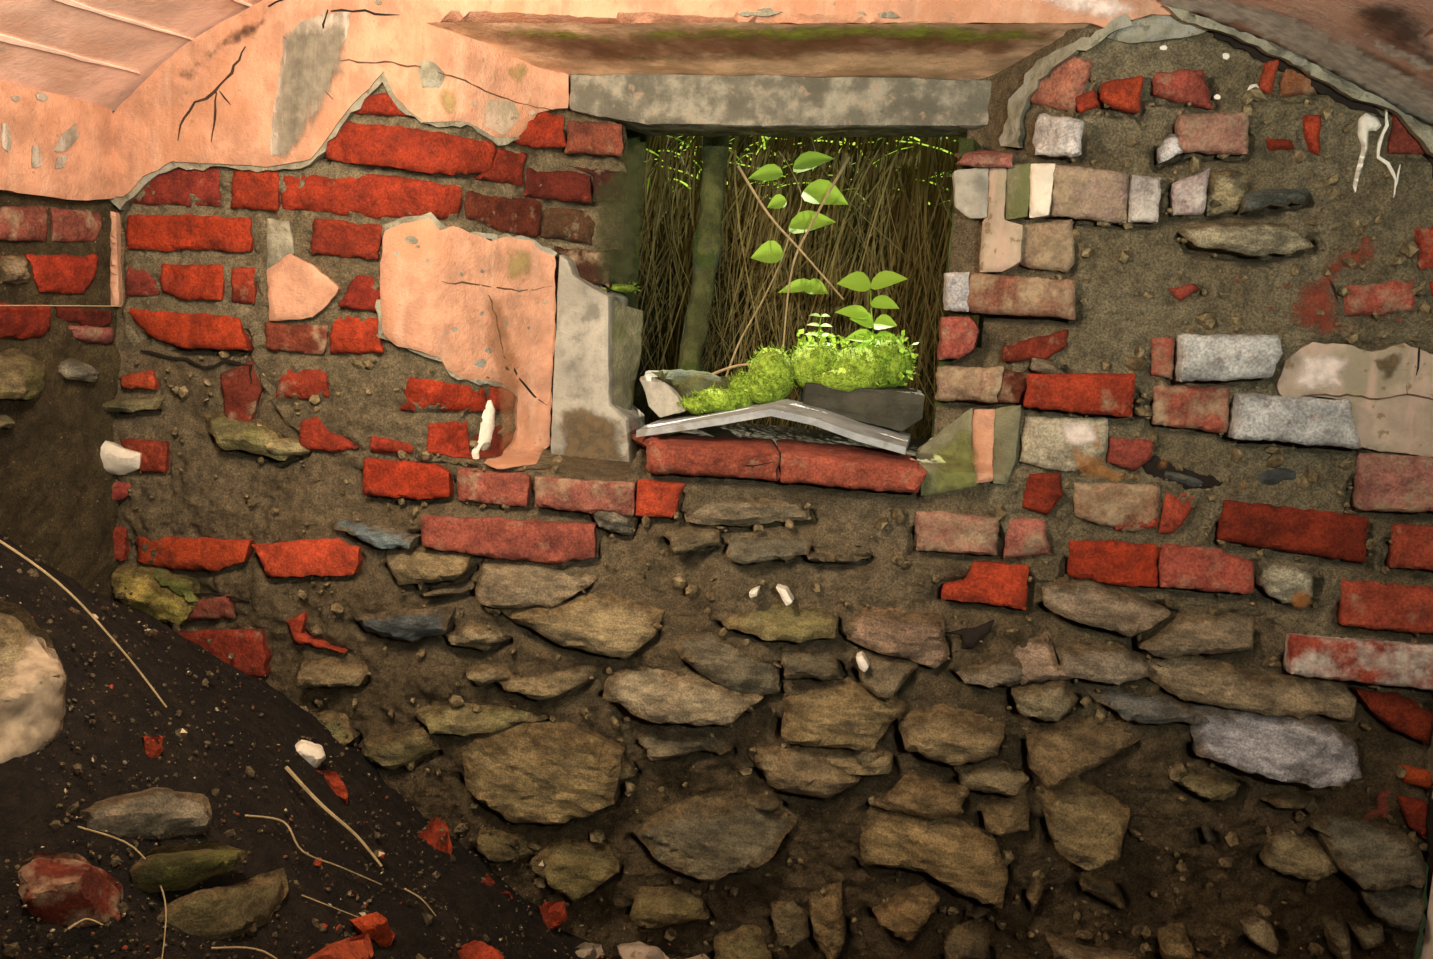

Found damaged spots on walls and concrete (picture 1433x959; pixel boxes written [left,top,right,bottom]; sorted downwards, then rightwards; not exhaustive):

crack [177,46,246,142]
crack [322,9,559,110]
spalling [109,12,629,471]
spalling [983,13,1433,644]
spalling [945,620,995,649]
spalling [1352,680,1433,799]